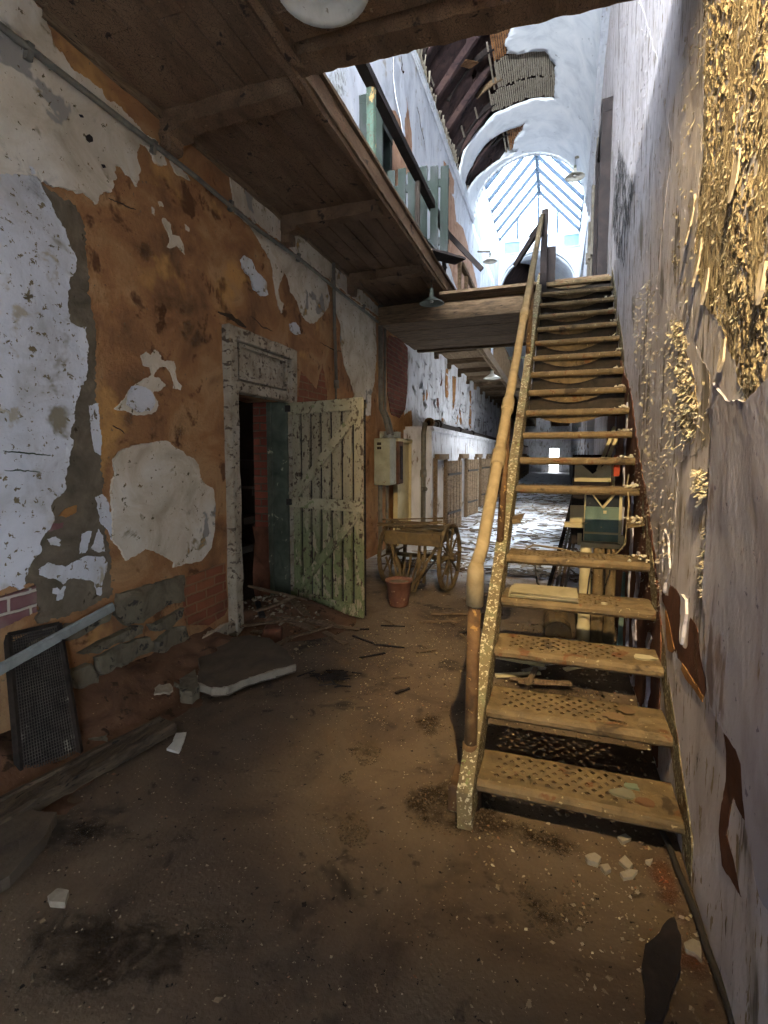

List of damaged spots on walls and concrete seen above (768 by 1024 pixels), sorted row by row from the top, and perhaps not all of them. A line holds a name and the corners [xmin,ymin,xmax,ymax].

peeling [0,0,236,639]
peeling [229,161,511,438]
peeling [601,0,768,910]